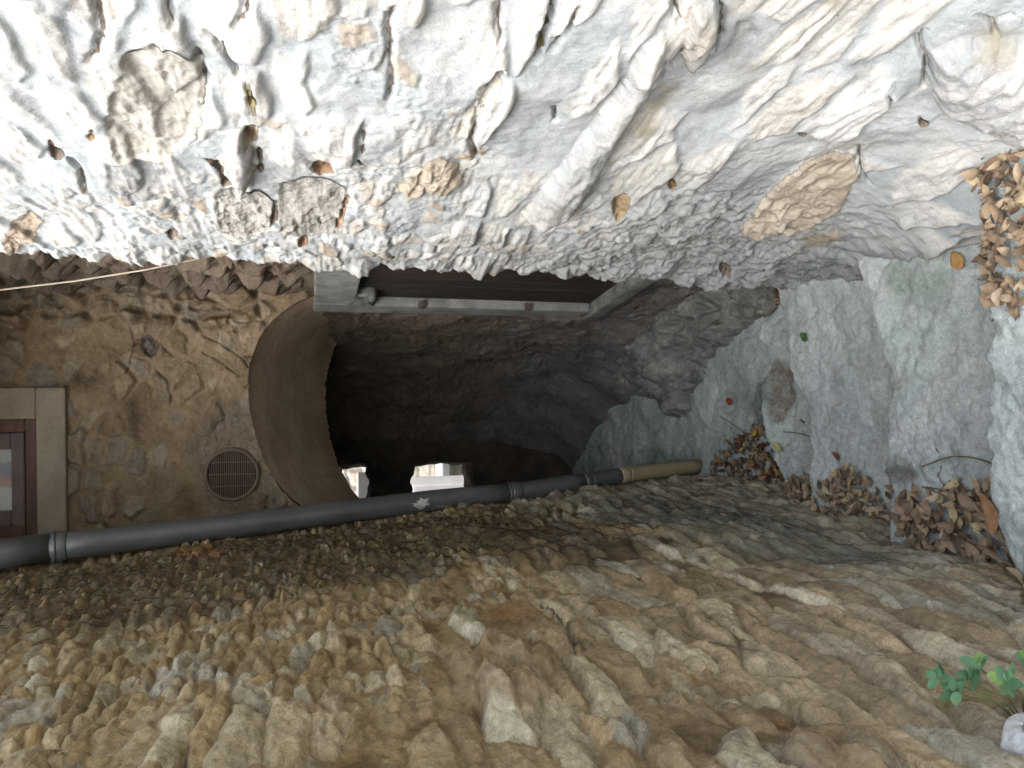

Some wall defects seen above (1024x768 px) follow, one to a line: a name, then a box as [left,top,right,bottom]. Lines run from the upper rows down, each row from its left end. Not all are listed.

spalling [87,45,205,200]
spalling [205,158,349,247]
spalling [396,157,462,202]
spalling [740,152,861,241]